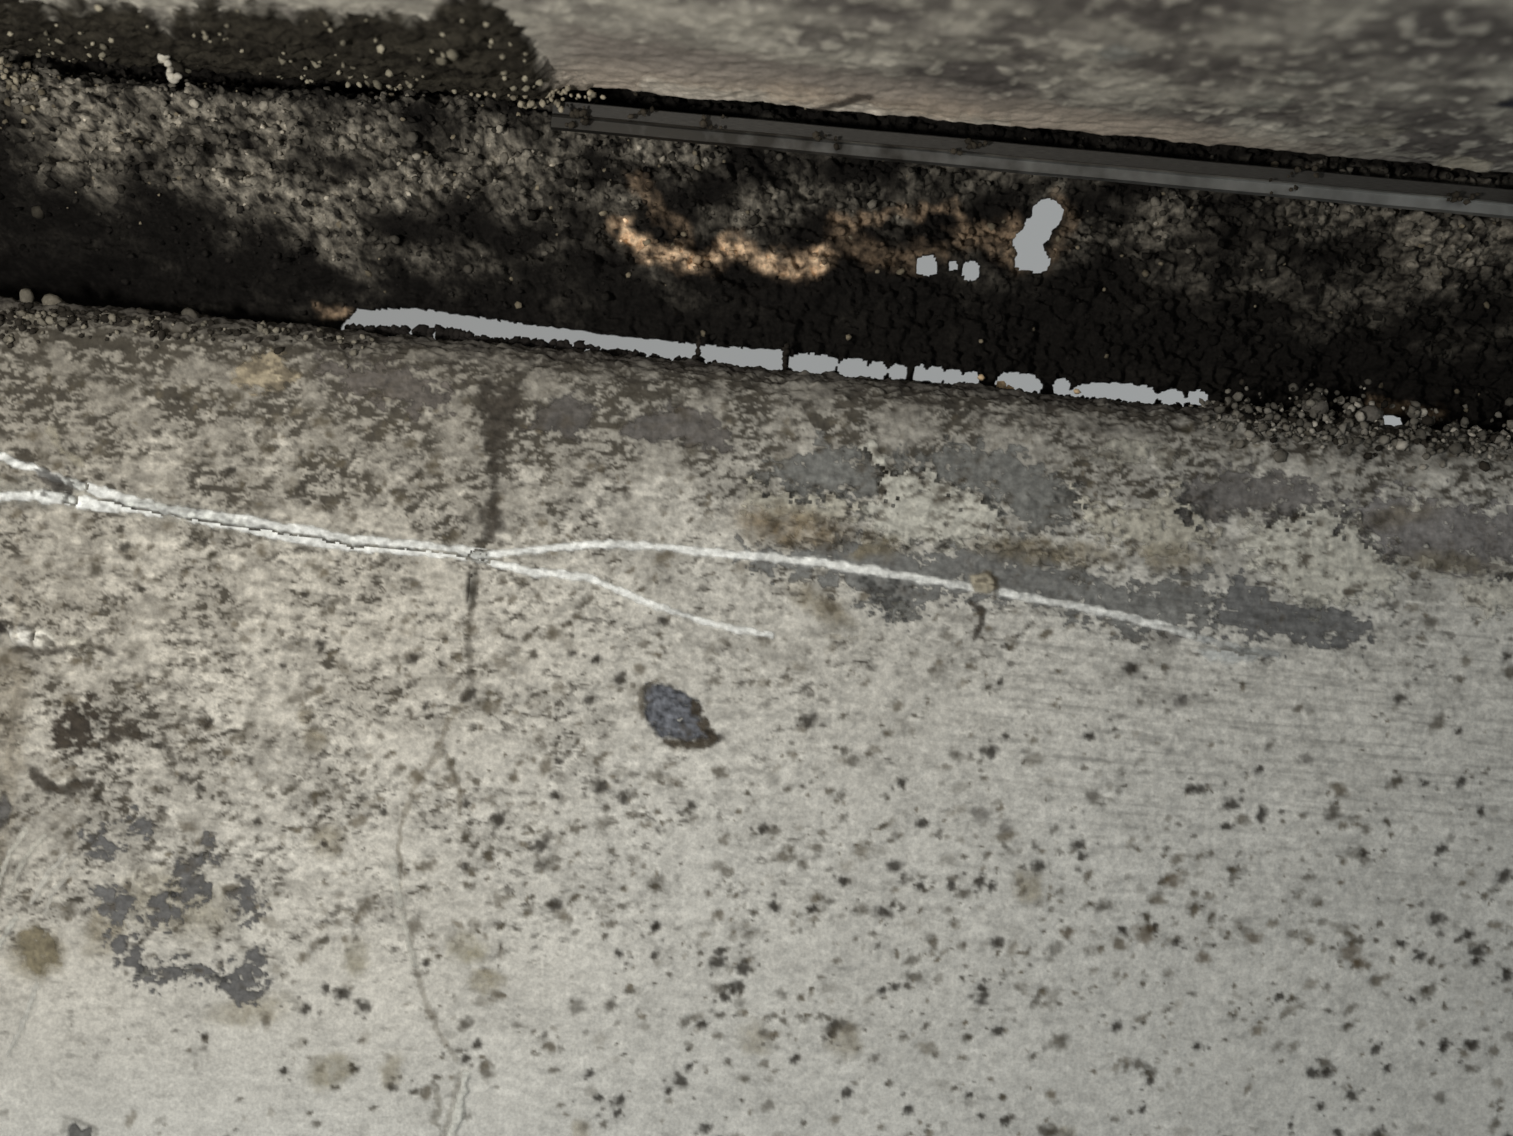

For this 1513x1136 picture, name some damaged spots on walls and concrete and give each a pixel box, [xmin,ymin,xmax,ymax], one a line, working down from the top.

damp [638,76,1010,126]
crack [0,378,1279,663]
crack [447,1071,469,1136]